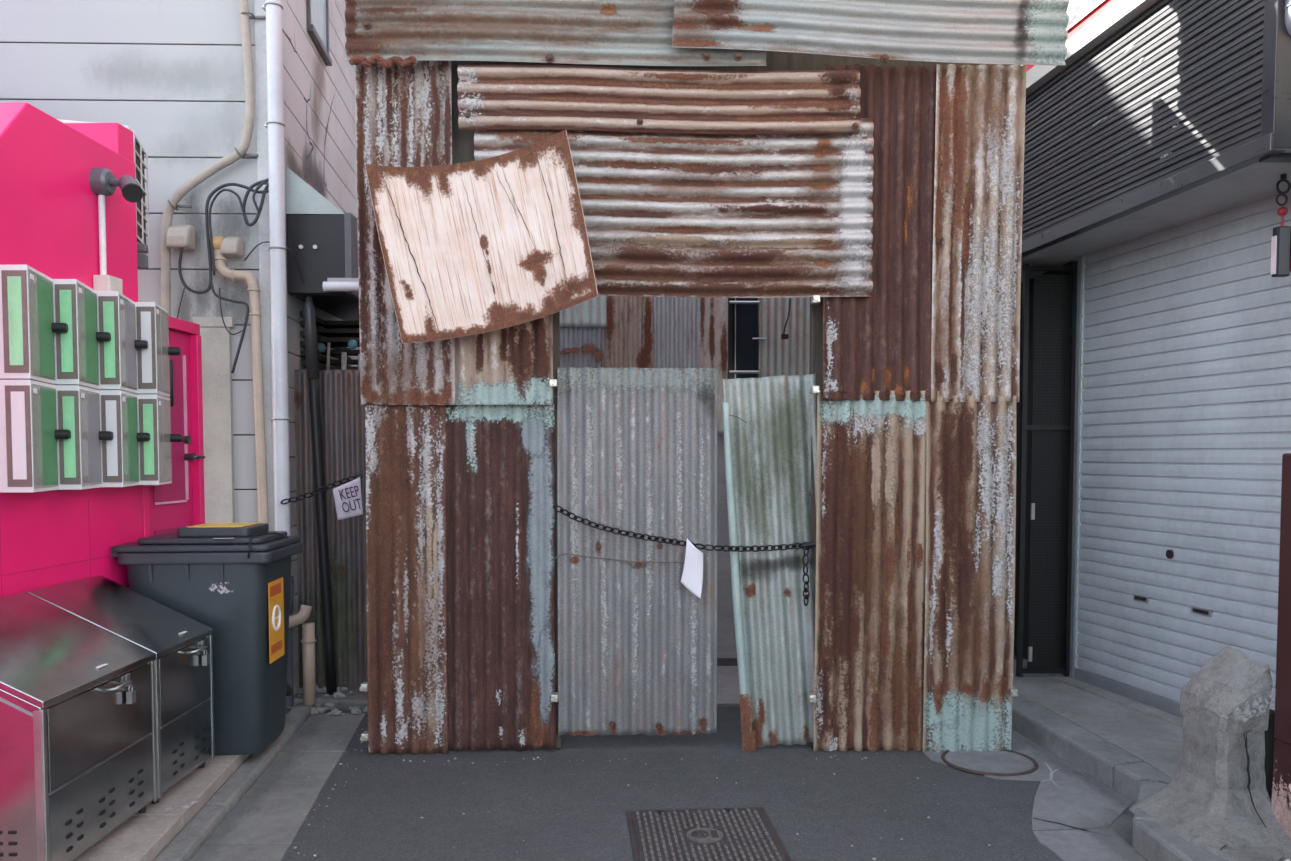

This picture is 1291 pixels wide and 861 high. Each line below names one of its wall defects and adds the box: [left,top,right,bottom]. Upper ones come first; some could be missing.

corrosion [345,0,865,736]
corrosion [803,66,1006,751]
corrosion [523,679,551,747]
corrosion [740,694,778,753]
crack [1243,730,1267,828]